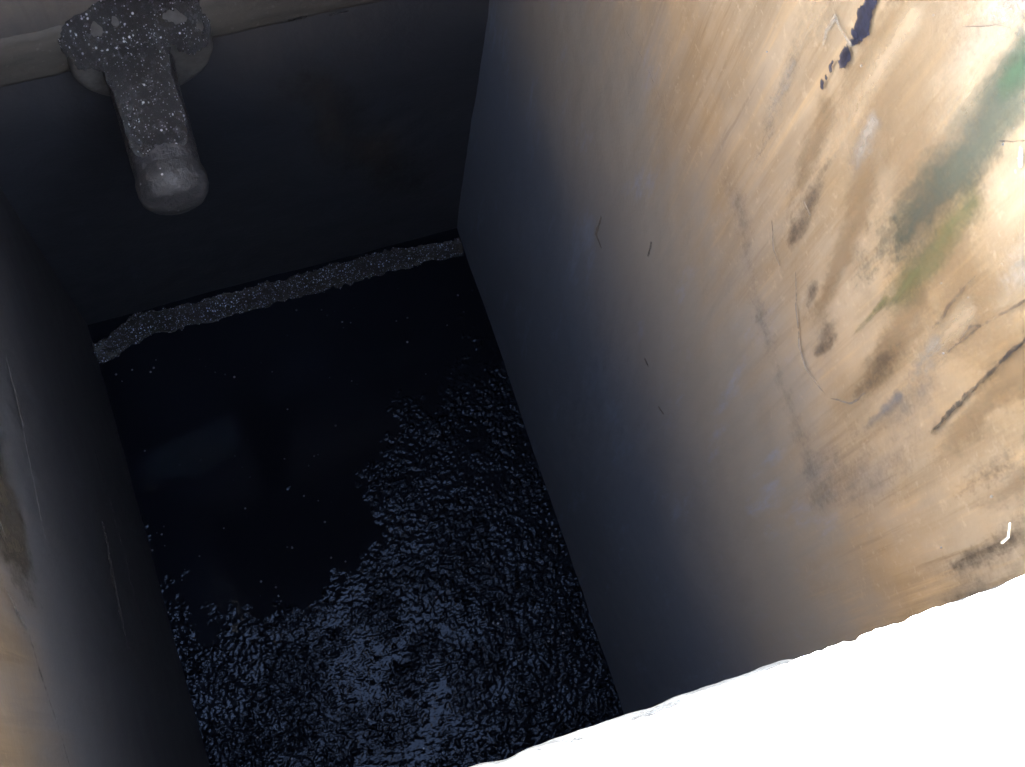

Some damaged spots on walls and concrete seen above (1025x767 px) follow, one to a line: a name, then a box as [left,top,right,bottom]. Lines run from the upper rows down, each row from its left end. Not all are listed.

peeling [820,28,858,89]